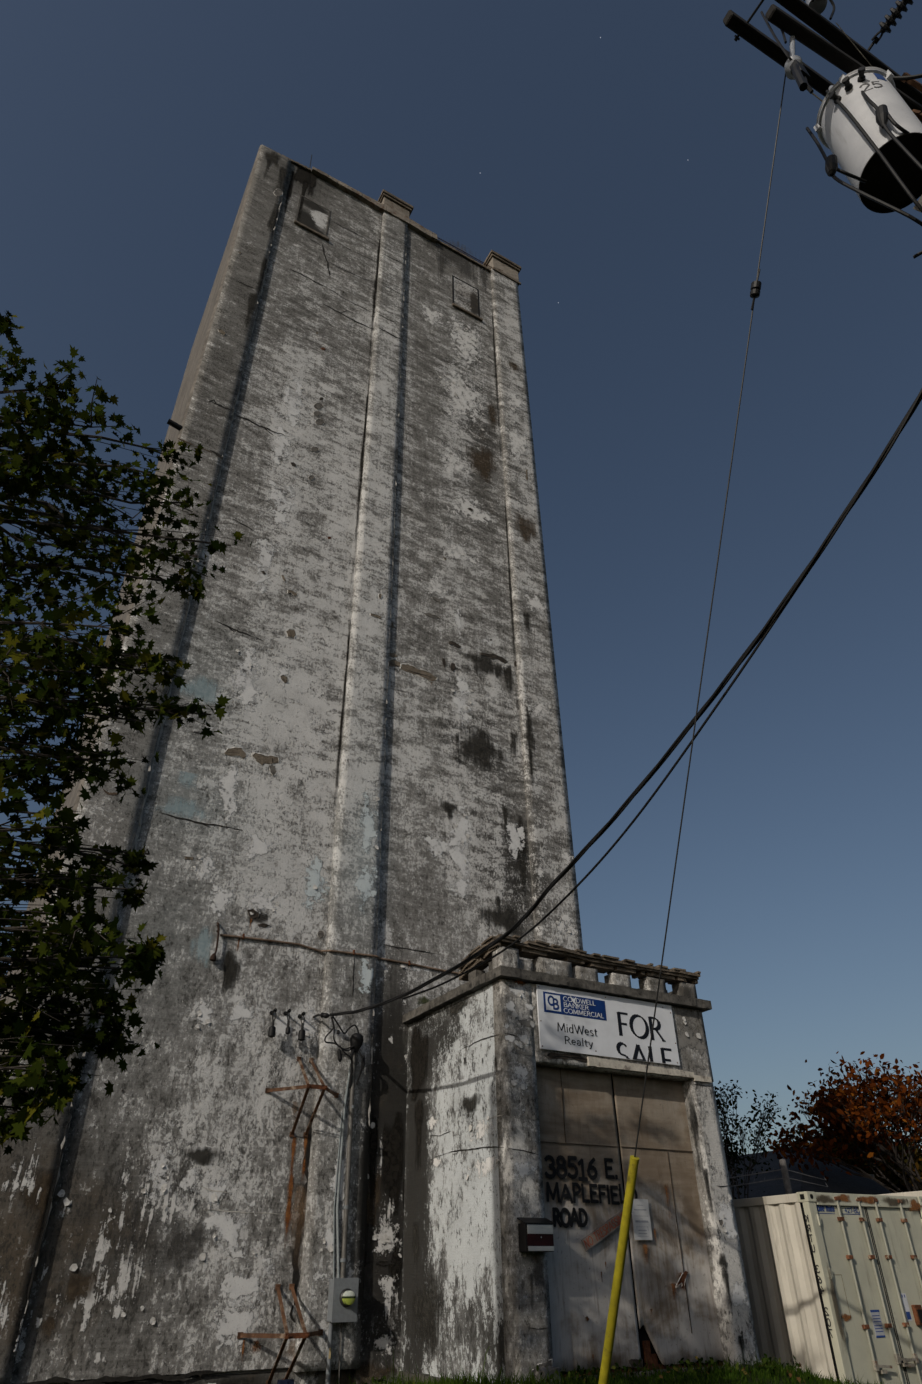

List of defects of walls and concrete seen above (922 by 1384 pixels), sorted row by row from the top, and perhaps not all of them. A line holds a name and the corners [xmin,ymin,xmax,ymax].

crack [103,202,406,913]
water stain [456,505,536,777]
crack [35,1022,96,1267]
peeling [0,1141,278,1382]
crack [202,1112,313,1323]
corrosion [285,1137,308,1233]
peeling [320,1227,333,1252]
peeling [372,1194,402,1258]
peeling [373,1275,402,1356]
water stain [367,1026,428,1232]
water stain [412,1277,444,1352]
water stain [462,1095,479,1113]